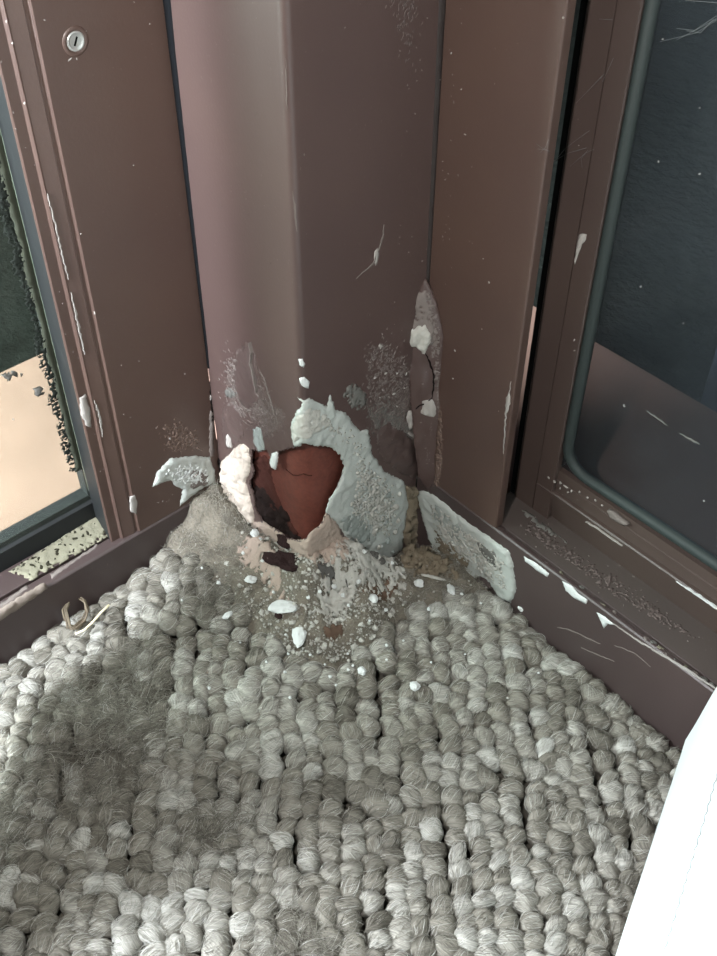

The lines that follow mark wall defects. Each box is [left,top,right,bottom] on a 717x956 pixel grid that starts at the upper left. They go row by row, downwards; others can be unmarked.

crack [416,353,435,409]
peeling [79,394,91,427]
peeling [153,395,233,506]
peeling [253,427,279,470]
peeling [291,359,549,612]